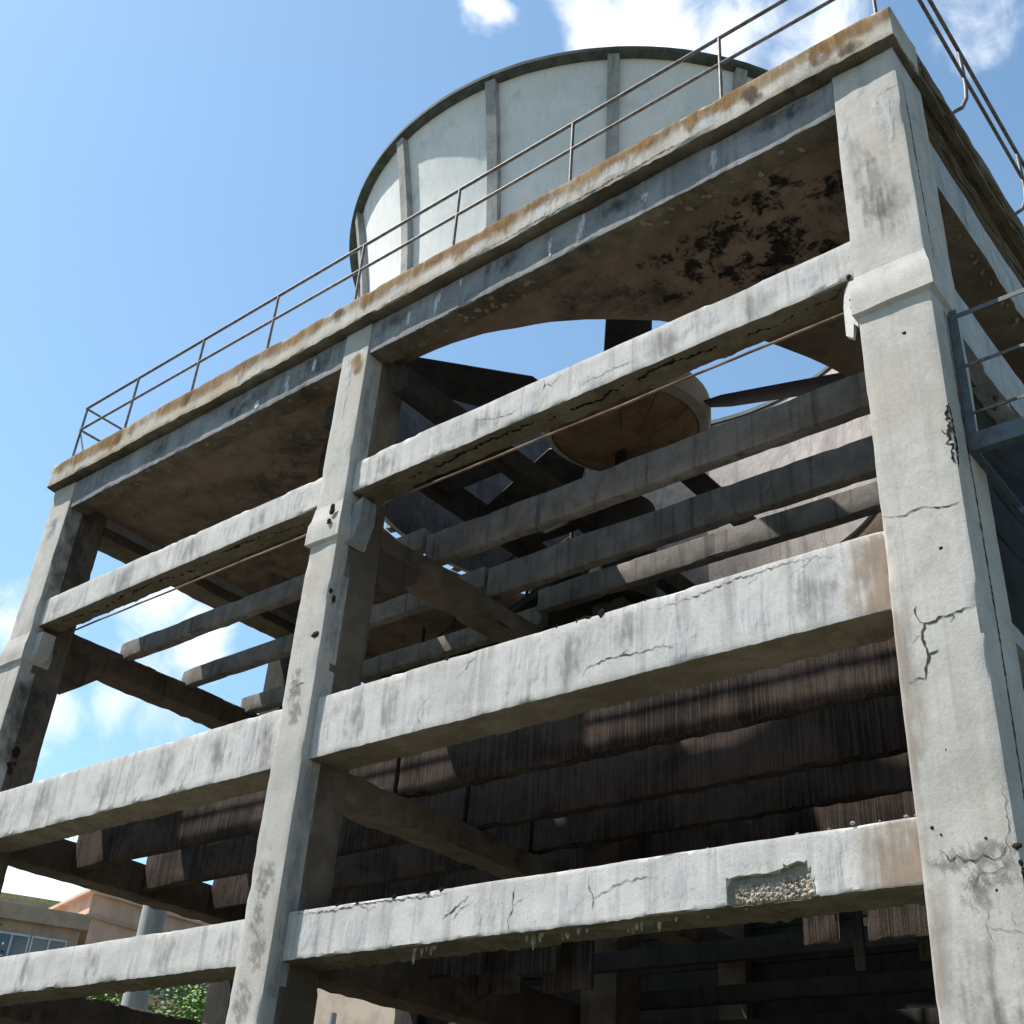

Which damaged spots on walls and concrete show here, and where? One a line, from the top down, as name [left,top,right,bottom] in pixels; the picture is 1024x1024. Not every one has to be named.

rust [158,67,779,413]
crack [747,289,842,337]
crack [374,346,717,490]
crack [581,634,697,677]
crack [884,312,1024,960]
spalling [297,863,926,972]
crack [588,876,658,907]